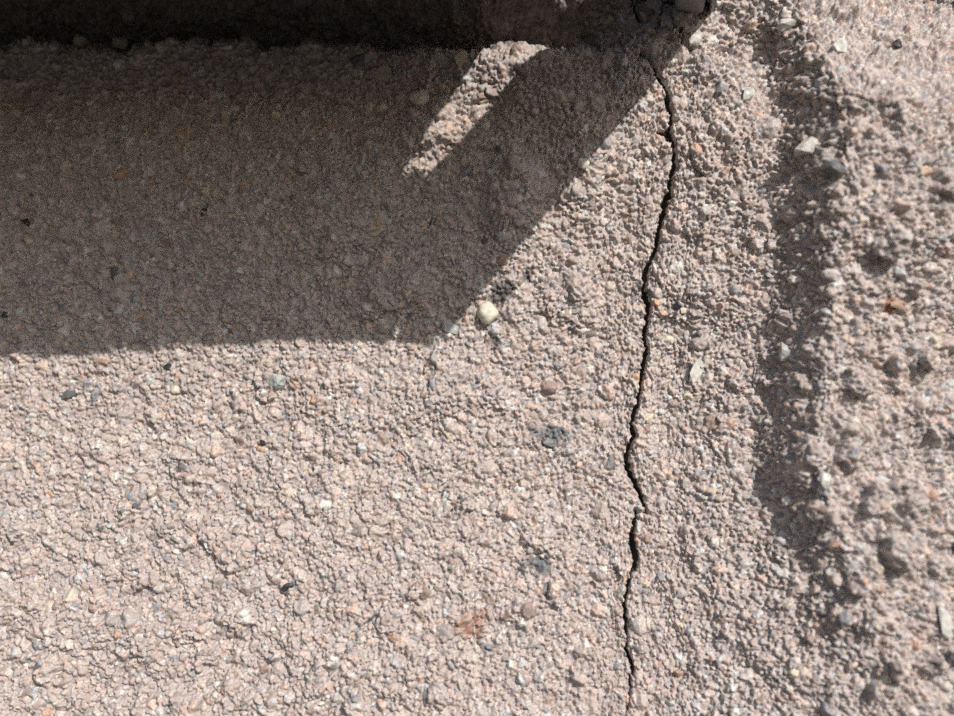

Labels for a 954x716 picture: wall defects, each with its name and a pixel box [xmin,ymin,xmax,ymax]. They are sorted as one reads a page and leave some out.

crack [621,55,676,712]